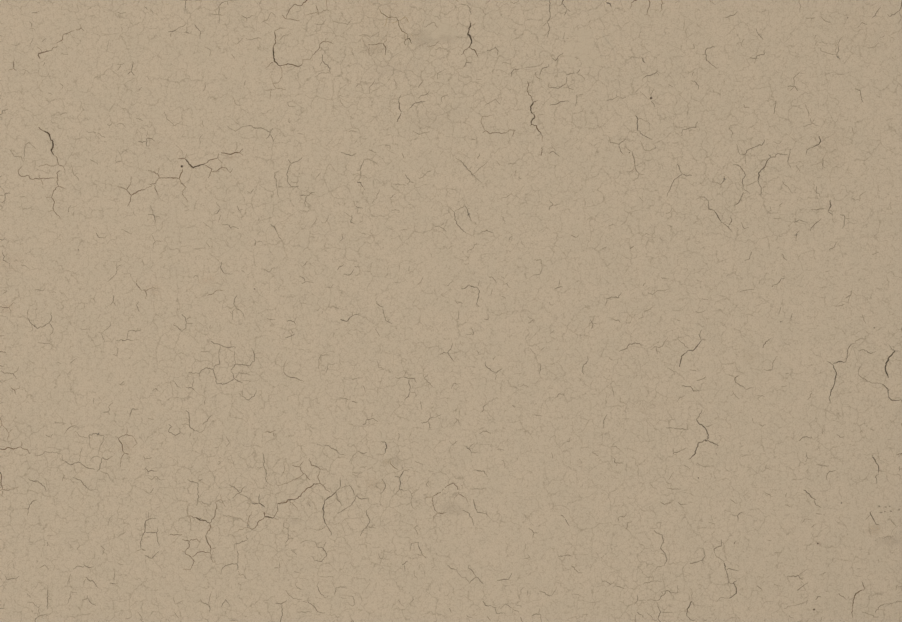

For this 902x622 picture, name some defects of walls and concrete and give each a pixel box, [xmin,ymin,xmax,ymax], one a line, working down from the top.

crack [0,0,586,622]
crack [605,0,665,17]
crack [606,44,718,202]
crack [666,72,866,321]